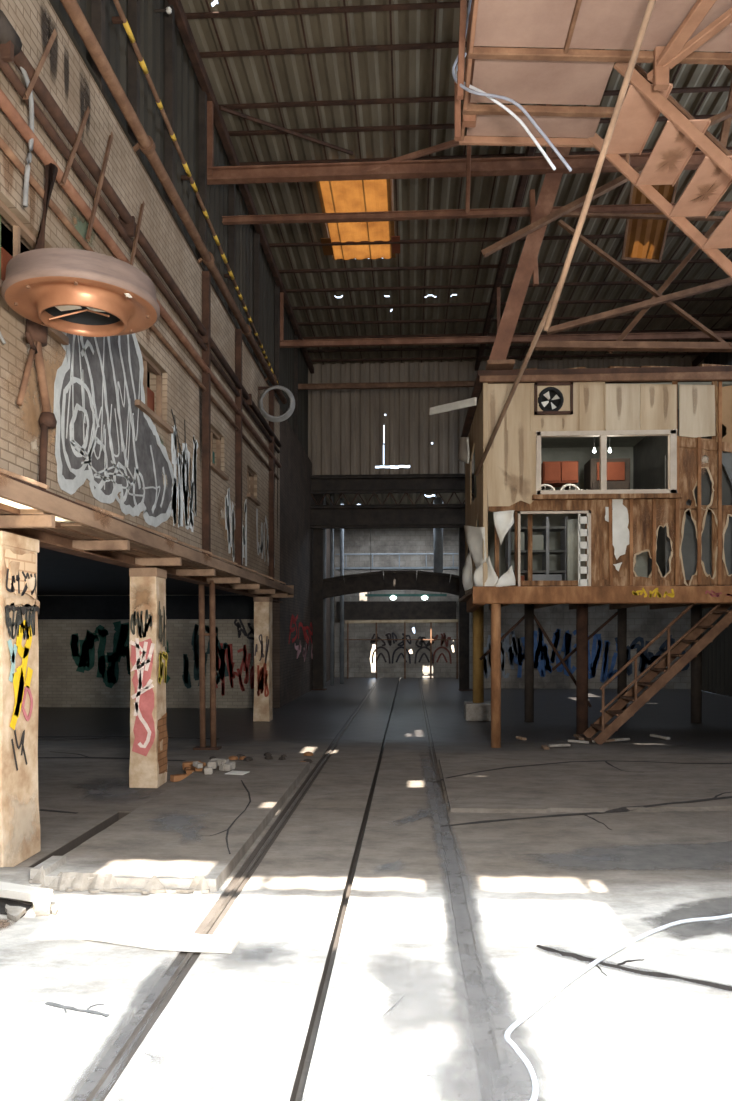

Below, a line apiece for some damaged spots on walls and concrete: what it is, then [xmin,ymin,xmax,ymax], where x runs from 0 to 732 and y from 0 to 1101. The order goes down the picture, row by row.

peeling [605,499,629,571]
crack [433,760,732,783]
crack [431,792,732,830]
leakage [528,841,732,870]
leakage [644,898,732,940]